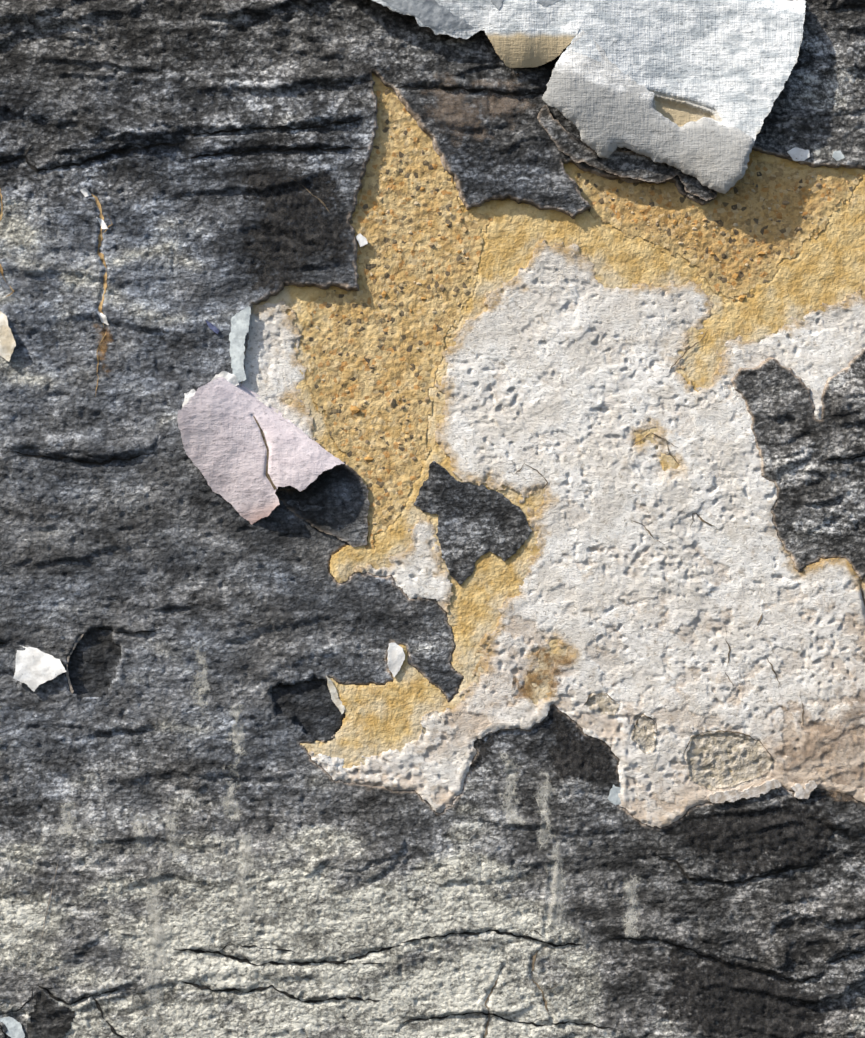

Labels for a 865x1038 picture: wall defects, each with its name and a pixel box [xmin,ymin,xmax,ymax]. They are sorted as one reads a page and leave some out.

peeling [177,0,865,828]
spalling [13,628,121,699]
crack [645,854,818,884]
spalling [0,992,75,1038]
crack [0,985,136,1038]
crack [172,929,865,1038]